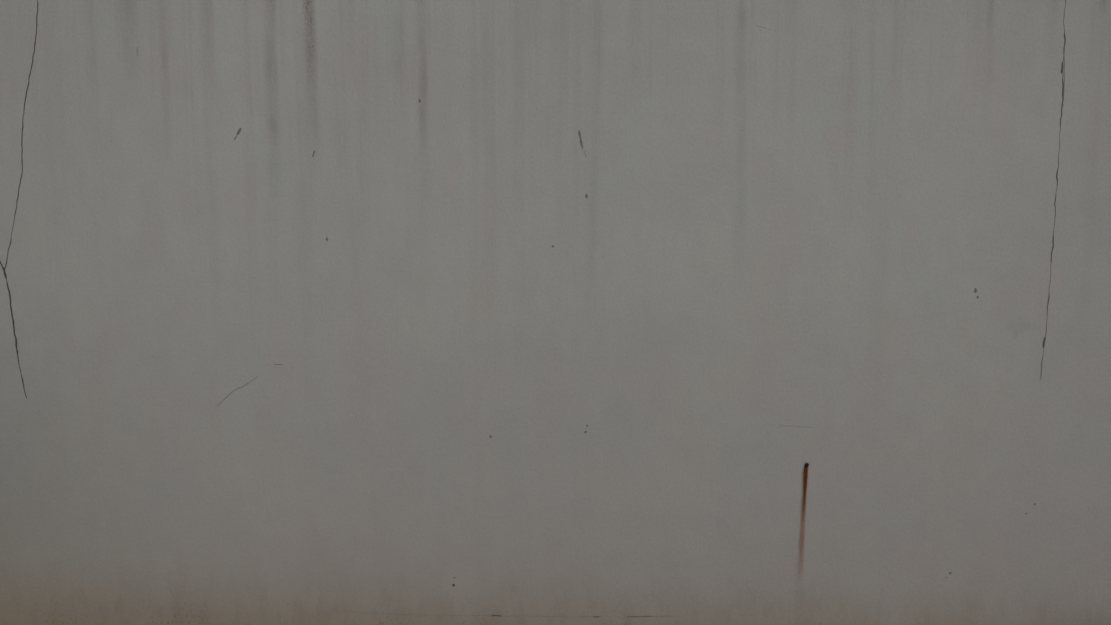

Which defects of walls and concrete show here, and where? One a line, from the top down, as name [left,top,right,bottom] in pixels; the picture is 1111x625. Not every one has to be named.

crack [1059,0,1067,130]
crack [0,1,38,399]
crack [1041,157,1059,372]